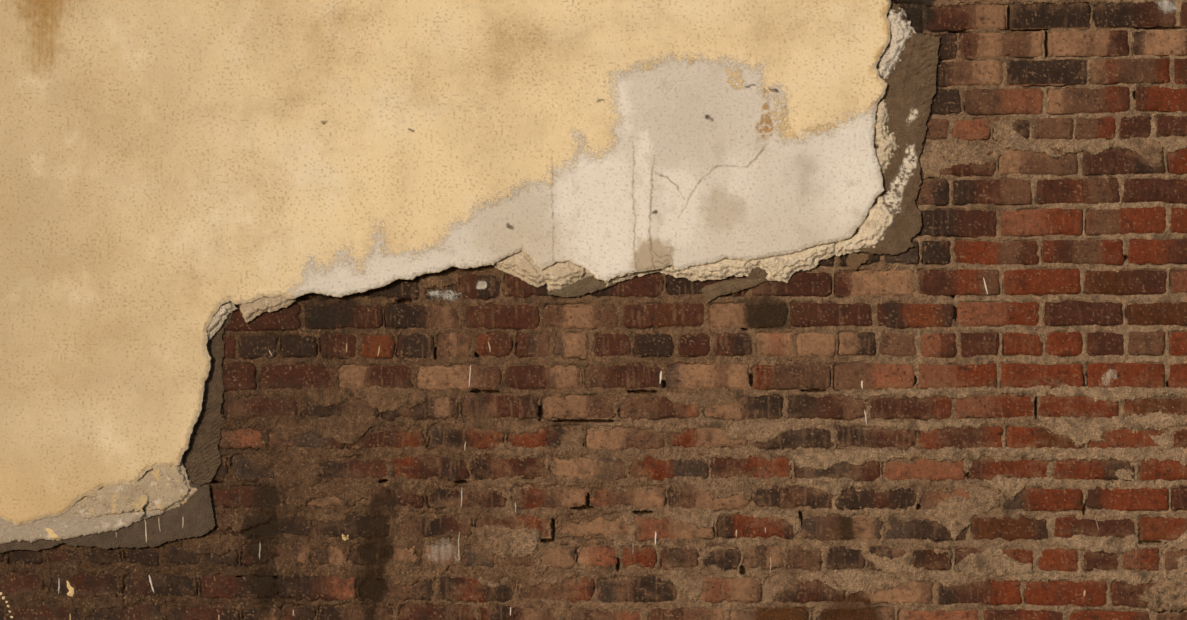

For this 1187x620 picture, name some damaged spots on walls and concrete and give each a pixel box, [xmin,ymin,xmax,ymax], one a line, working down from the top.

spalling [878,8,916,79]
peeling [207,53,900,340]